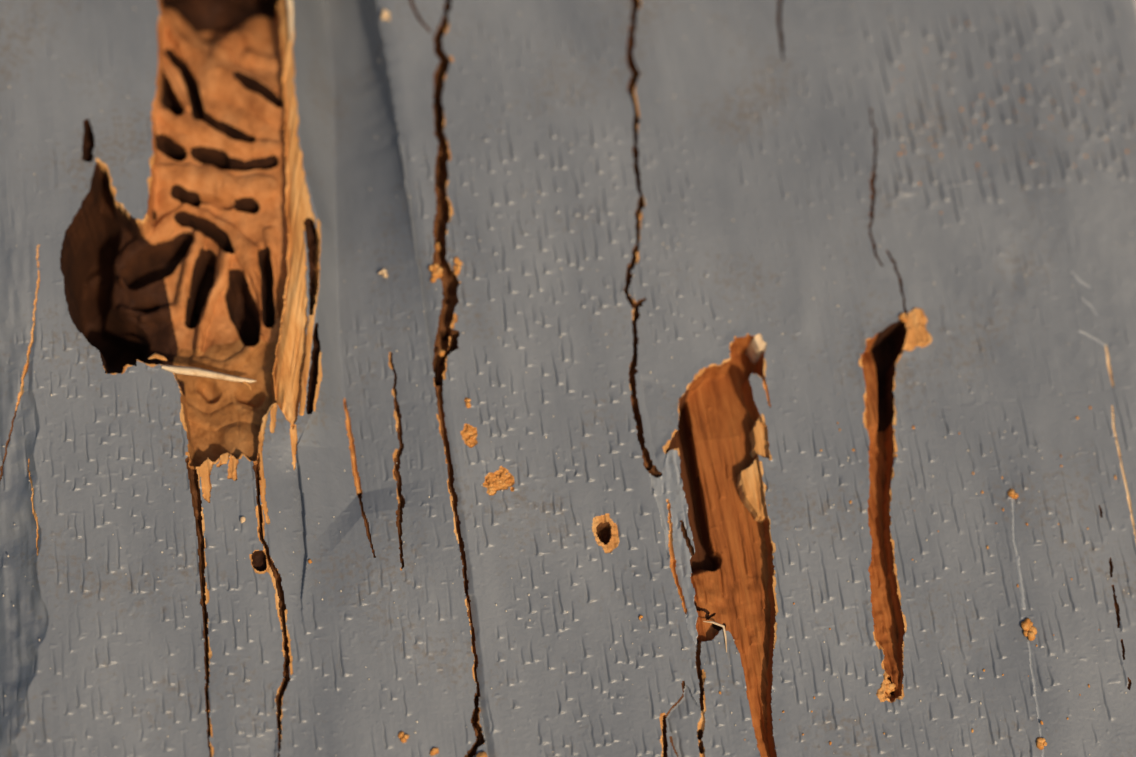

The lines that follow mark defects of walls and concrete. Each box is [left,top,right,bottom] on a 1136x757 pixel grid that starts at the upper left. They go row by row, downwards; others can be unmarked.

crack [777,0,785,60]
spalling [60,0,323,524]
crack [185,457,214,757]
crack [249,463,293,757]
crack [343,352,405,571]
crack [409,0,488,757]
crack [624,0,653,468]
peeling [643,449,698,650]
crack [659,601,726,757]
crack [868,108,908,317]